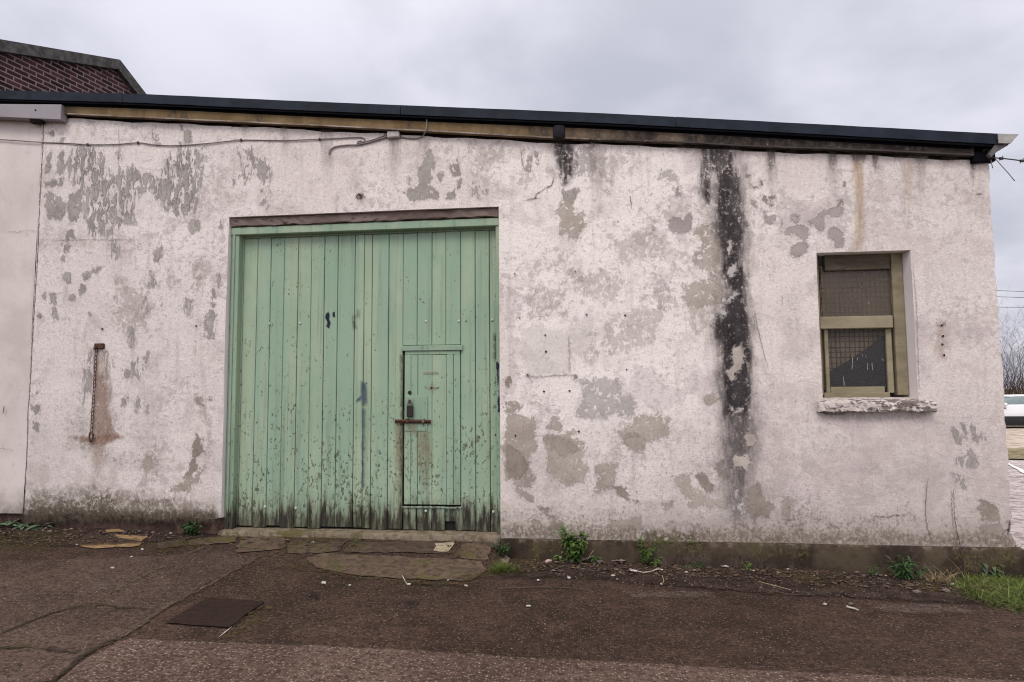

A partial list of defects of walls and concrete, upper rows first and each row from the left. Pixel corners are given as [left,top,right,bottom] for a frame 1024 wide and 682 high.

peeling [37,124,206,320]
peeling [403,149,487,201]
damp [555,140,573,184]
peeling [555,142,597,241]
peeling [746,174,846,259]
peeling [195,274,221,341]
damp [677,145,753,509]
corrosion [80,374,120,446]
peeling [495,369,671,533]
peeling [662,433,795,521]
peeling [951,422,987,490]
peeling [976,499,1006,536]